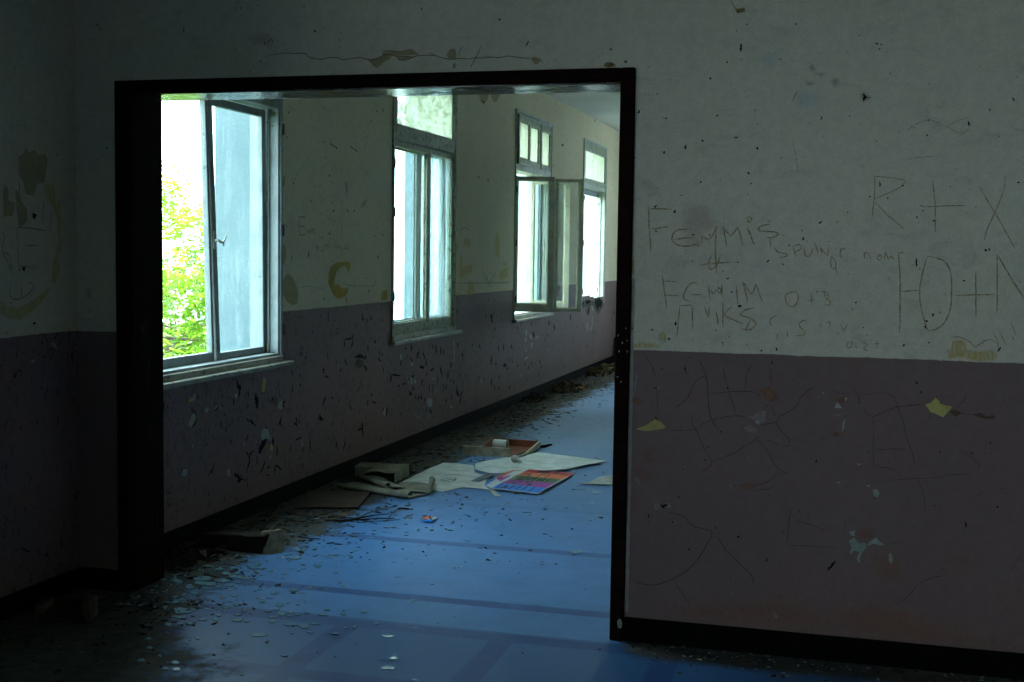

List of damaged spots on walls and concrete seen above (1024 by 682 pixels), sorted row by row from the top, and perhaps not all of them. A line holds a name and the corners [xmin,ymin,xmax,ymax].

crack [266,50,543,63]
peeling [187,369,311,488]
peeling [323,287,555,433]
flaking render [570,295,614,320]
flaking render [617,275,667,628]
crack [647,358,969,511]
peeling [924,395,996,420]